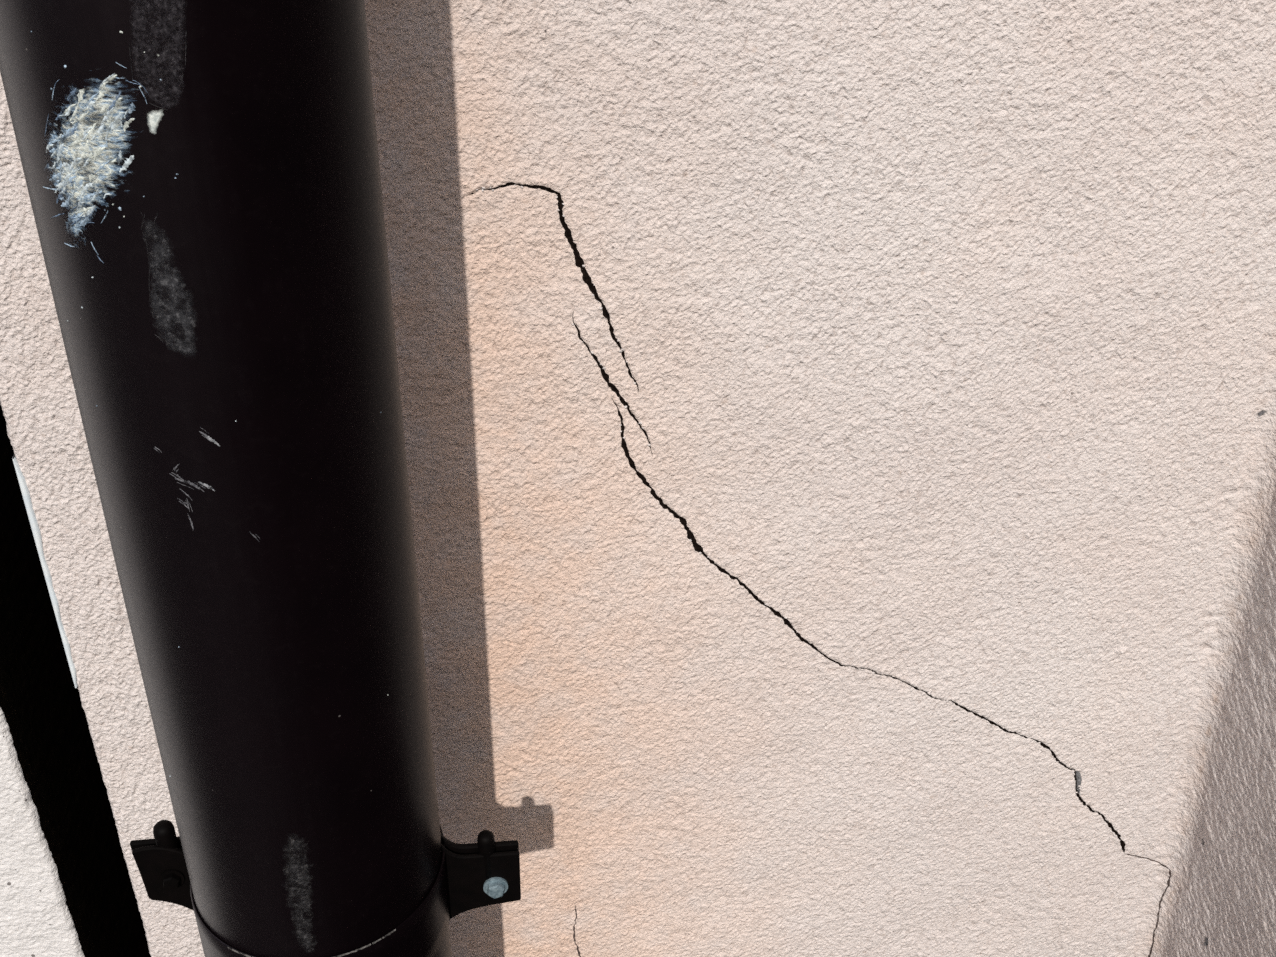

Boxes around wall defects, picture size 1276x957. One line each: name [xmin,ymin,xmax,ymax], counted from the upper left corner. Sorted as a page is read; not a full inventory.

crack [468,182,1171,957]